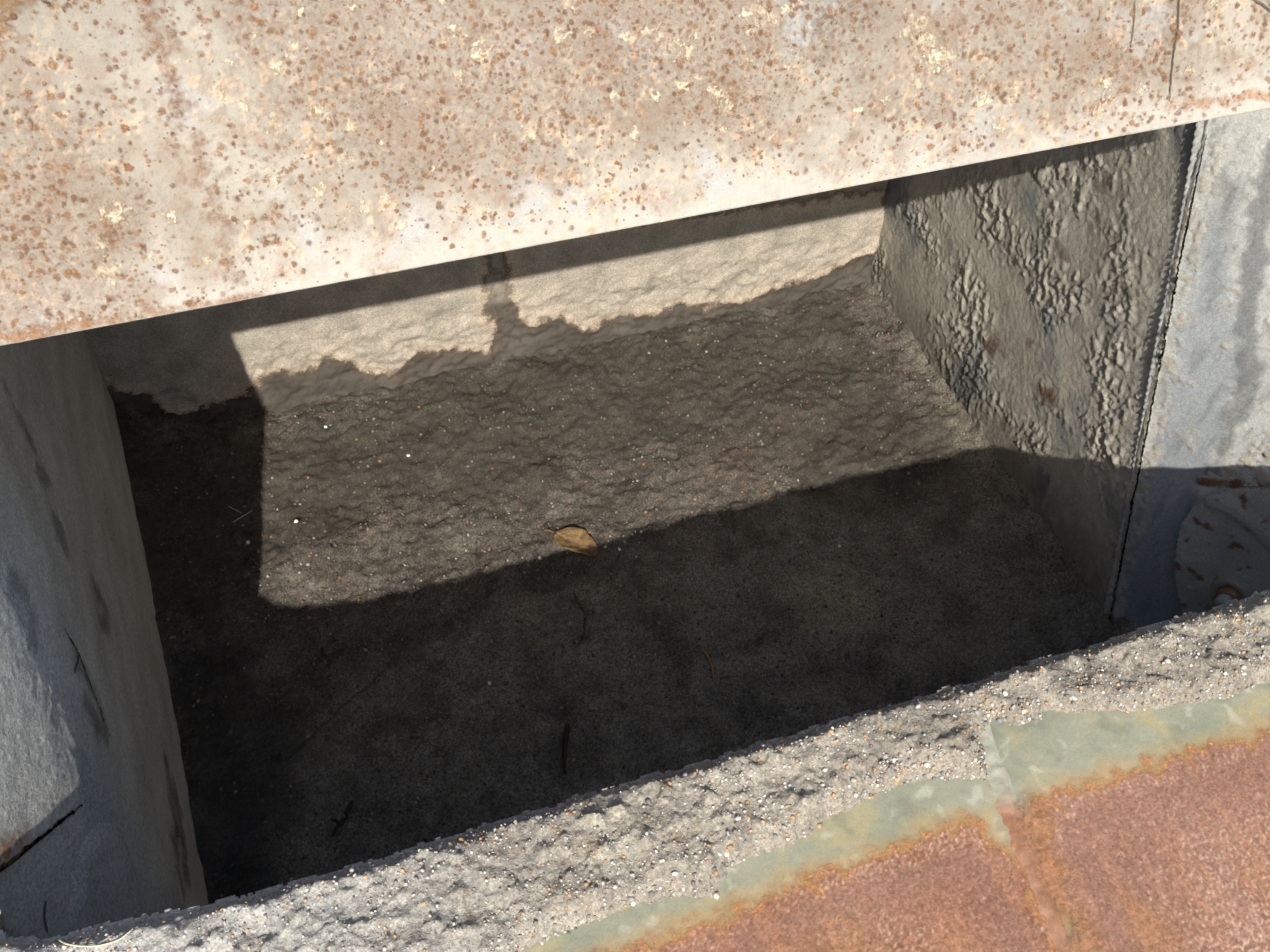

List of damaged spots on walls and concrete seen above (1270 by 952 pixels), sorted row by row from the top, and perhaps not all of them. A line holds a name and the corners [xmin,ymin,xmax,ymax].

crack [1169,0,1180,102]
peeling [674,75,733,110]
rust [1168,90,1268,107]
rust [0,109,140,341]
peeling [100,202,131,222]
crack [0,799,86,872]
rust [623,730,1270,952]
crack [42,900,50,932]